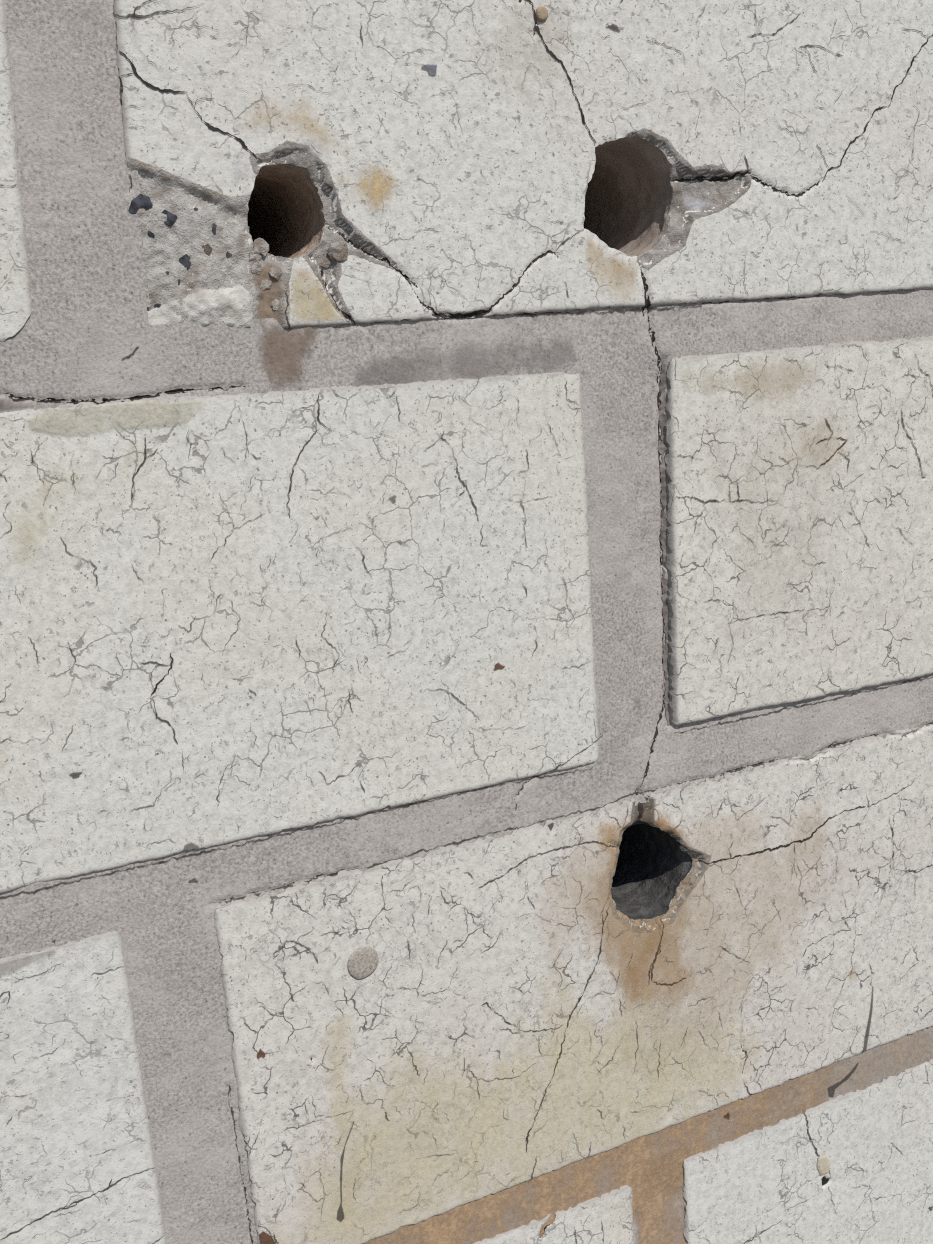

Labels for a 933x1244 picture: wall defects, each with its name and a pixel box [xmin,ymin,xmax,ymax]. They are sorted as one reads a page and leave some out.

crack [115,0,265,162]
spalling [127,141,397,328]
crack [324,190,586,319]
crack [517,0,657,143]
spalling [626,128,751,269]
crack [672,0,933,293]
crack [0,381,603,831]
crack [635,267,933,821]
crack [237,748,932,1198]
corrosion [600,830,683,997]
spalling [608,797,711,933]
corrosion [364,1064,833,1244]